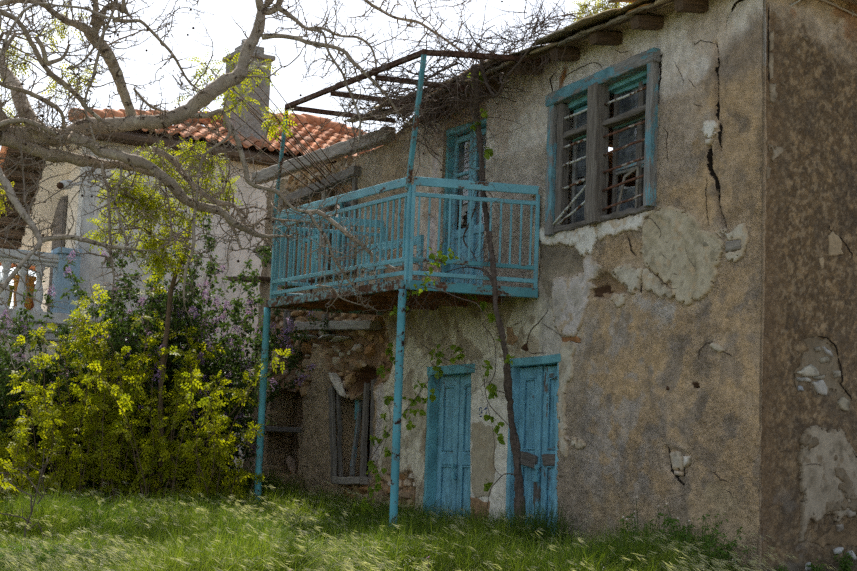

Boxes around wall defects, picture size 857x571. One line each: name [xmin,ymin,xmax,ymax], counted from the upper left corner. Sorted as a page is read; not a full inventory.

crack [765,5,773,82]
crack [657,40,727,227]
peeling [531,210,673,458]
spalling [793,336,852,411]
flaking render [668,447,691,486]
spalling [811,454,857,560]